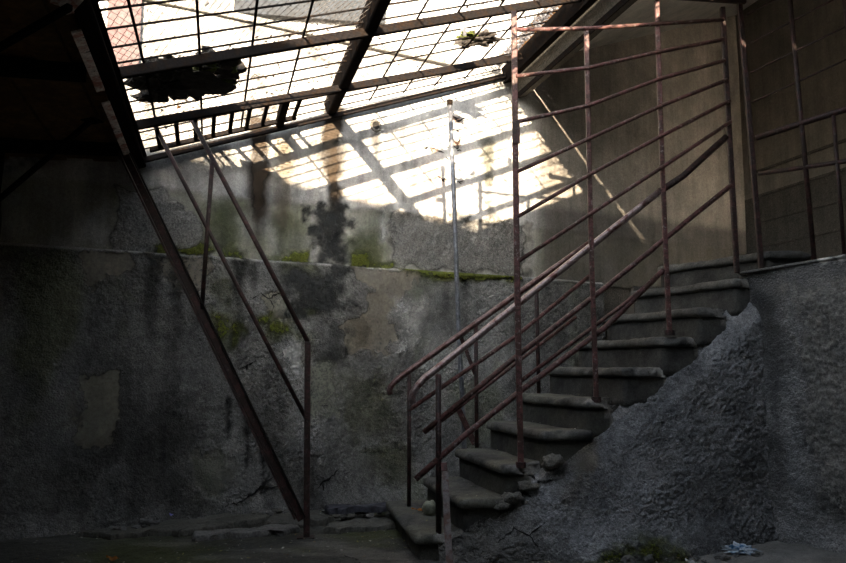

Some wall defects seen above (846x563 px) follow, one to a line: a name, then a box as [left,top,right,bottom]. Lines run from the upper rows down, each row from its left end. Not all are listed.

crack [498,522,545,547]